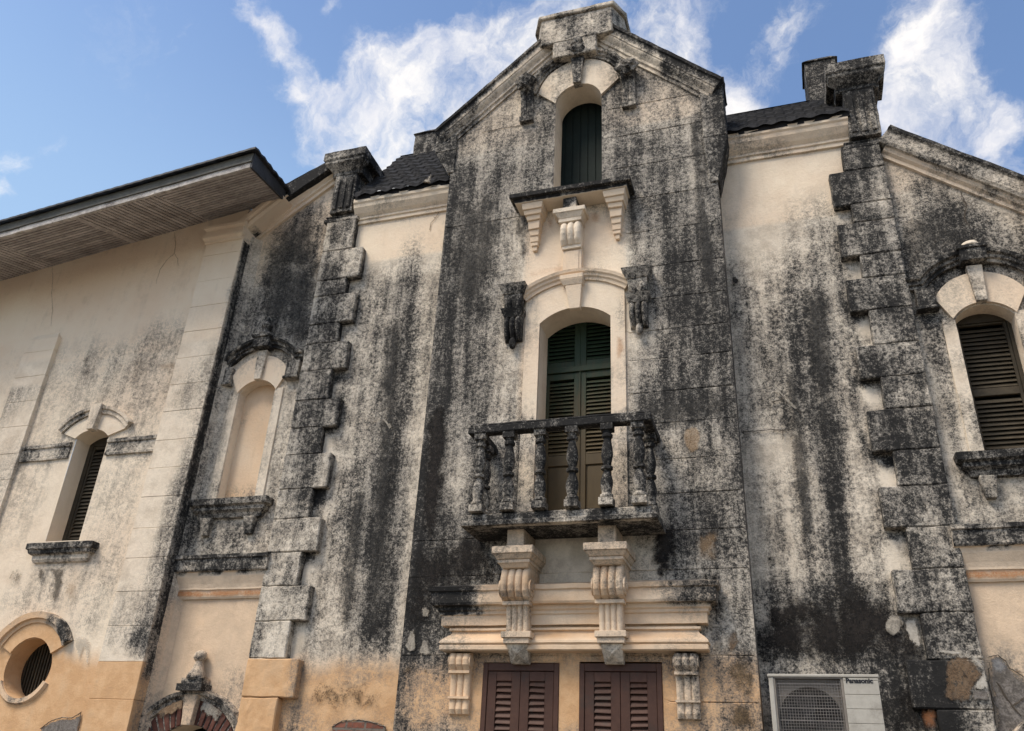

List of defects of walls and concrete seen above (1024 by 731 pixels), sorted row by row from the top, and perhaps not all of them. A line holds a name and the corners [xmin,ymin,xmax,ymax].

damp [533,58,568,96]
damp [590,47,621,76]
damp [523,268,628,302]
damp [57,405,134,434]
damp [786,373,812,540]
damp [406,404,493,622]
damp [0,611,74,646]
damp [439,626,509,653]
damp [526,625,602,653]
damp [621,624,711,653]
damp [757,513,929,731]
flaking render [937,650,1024,731]